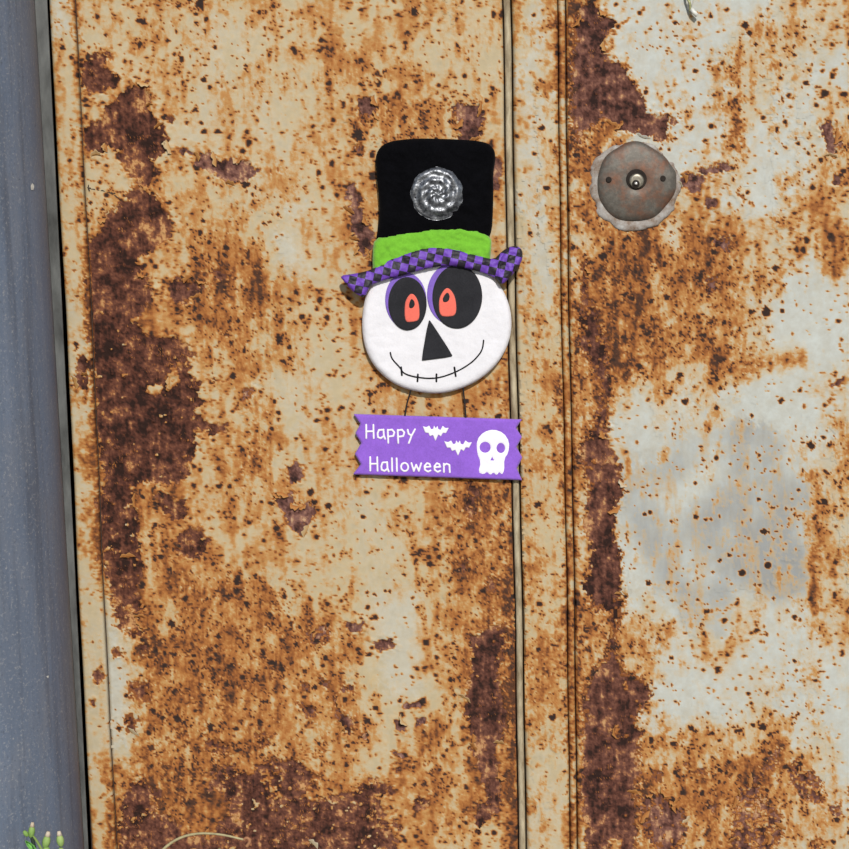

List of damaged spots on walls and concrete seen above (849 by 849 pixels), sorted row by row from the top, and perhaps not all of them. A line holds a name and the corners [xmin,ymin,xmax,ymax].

rust [403,0,462,24]
rust [344,90,461,176]
peeling [819,120,844,158]
rust [173,186,300,428]
rust [555,0,824,503]
rust [516,81,568,822]
rust [816,416,849,603]
rust [110,558,373,822]
rust [431,478,517,810]
rust [577,590,666,734]
rust [618,677,842,849]